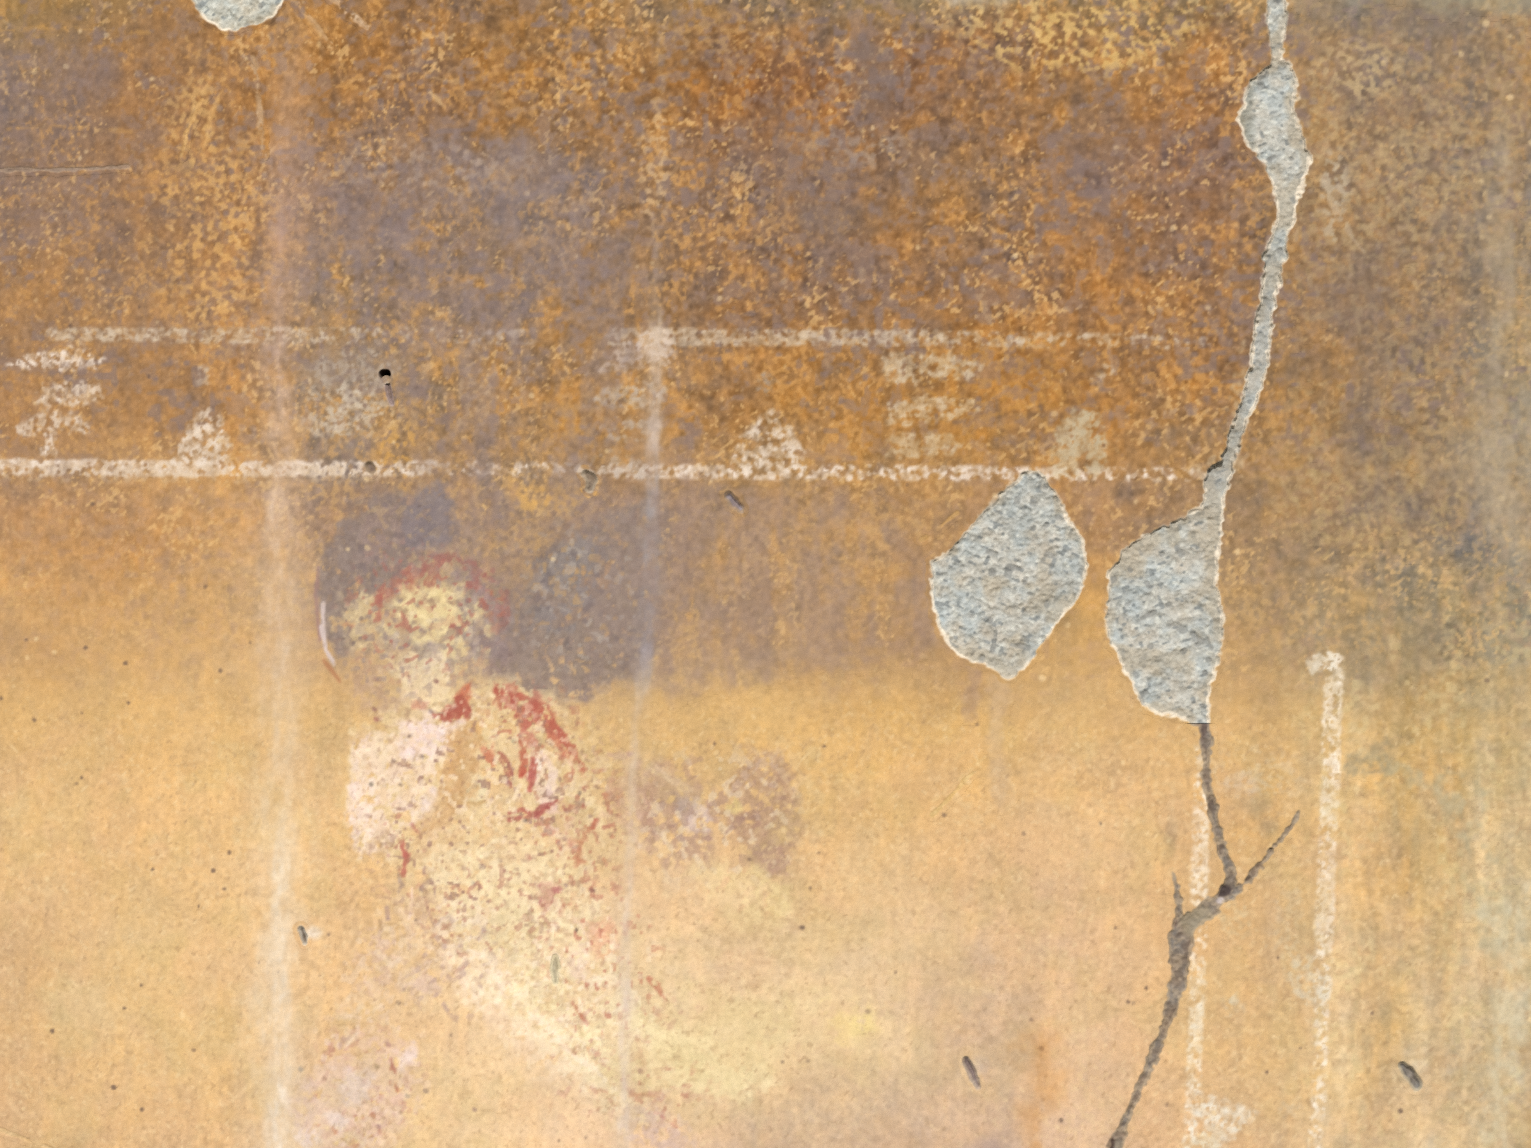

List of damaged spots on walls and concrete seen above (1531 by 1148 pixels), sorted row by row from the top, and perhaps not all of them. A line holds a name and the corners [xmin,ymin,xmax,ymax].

flaking render [187,0,287,36]
flaking render [1232,60,1316,187]
crack [1260,0,1293,61]
crack [1193,186,1309,503]
flaking render [925,463,1229,723]
crack [1101,724,1306,1148]